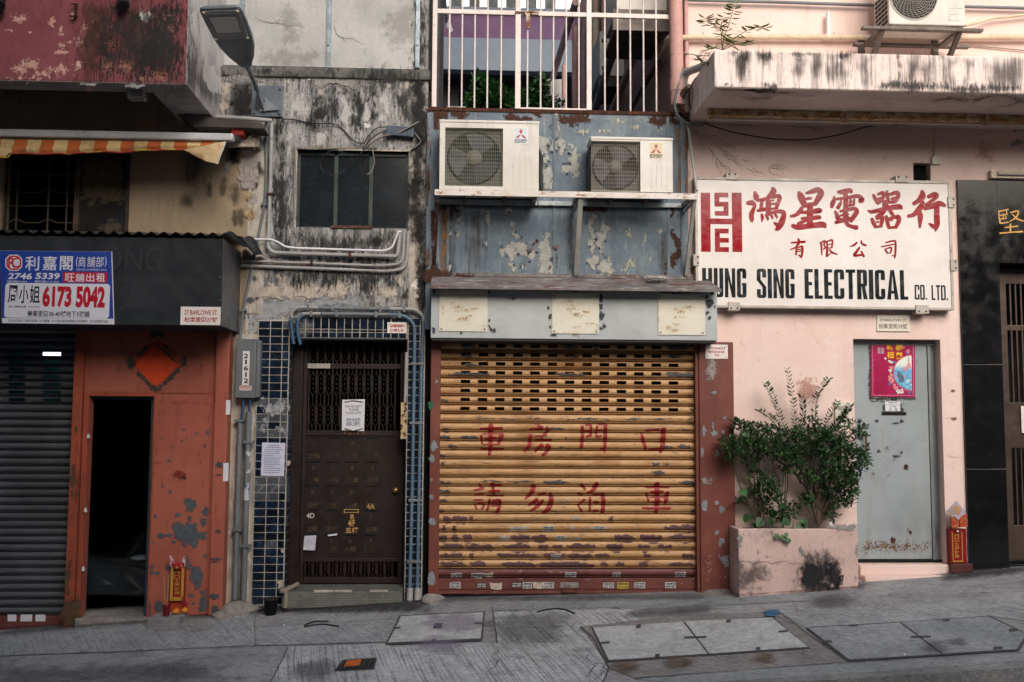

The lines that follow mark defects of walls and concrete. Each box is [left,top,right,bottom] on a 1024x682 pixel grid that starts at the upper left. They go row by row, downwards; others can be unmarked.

peeling [6,9,96,86]
mould [230,68,272,117]
rust [425,106,470,132]
rust [503,112,542,121]
rust [558,114,609,127]
water stain [725,51,771,85]
water stain [861,55,1021,106]
water stain [255,0,428,312]
peeling [481,205,558,274]
rust [664,208,681,275]
peeling [153,498,210,612]
peeling [427,516,695,585]